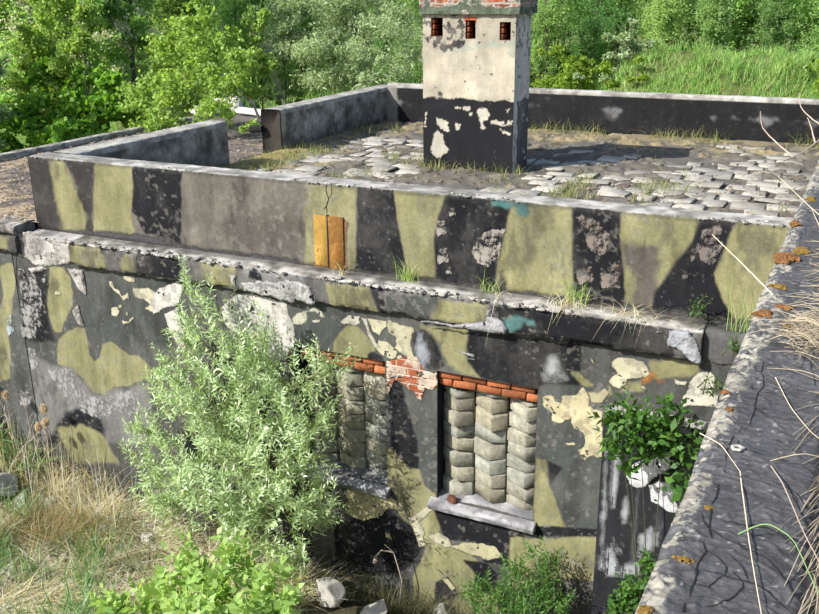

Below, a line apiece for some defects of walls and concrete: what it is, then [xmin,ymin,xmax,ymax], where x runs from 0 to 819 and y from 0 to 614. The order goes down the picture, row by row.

flaking render [6,229,574,419]
flaking render [543,357,650,460]
crack [726,364,819,485]
crack [682,484,812,613]
crack [764,479,808,510]